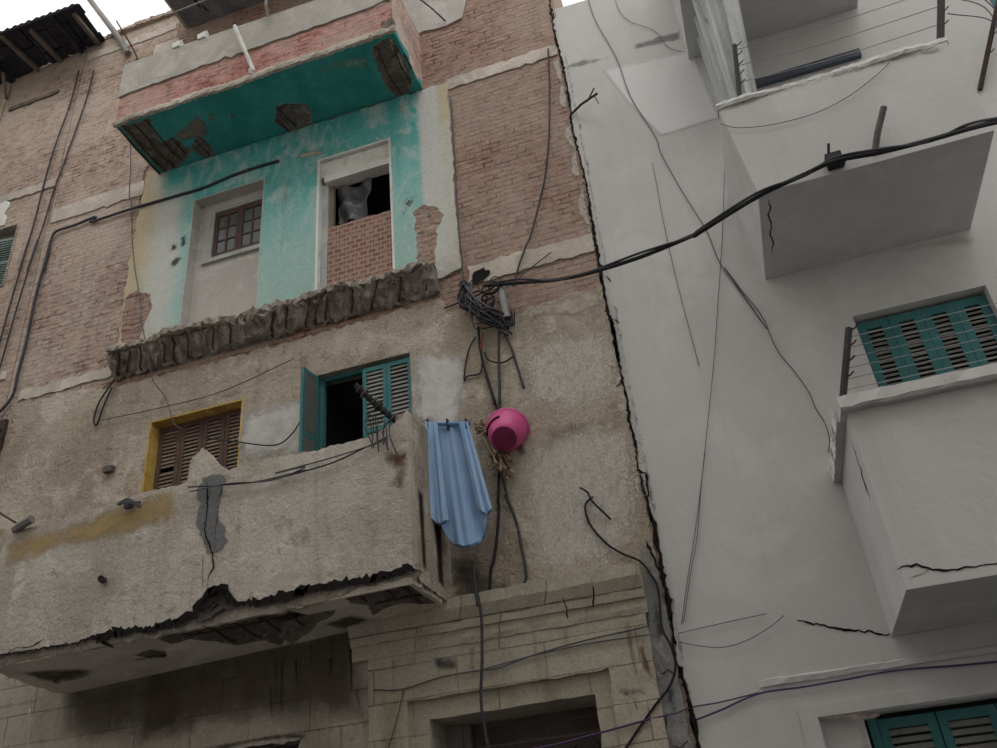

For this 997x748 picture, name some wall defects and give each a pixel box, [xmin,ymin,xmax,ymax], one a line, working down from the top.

spalling [119,115,215,175]
spalling [275,103,312,132]
spalling [413,205,444,271]
crack [766,200,774,250]
spalling [116,290,152,376]
crack [548,0,701,748]
crack [851,442,870,498]
leakage [10,494,172,561]
crack [0,479,223,656]
crack [896,563,997,577]
spalling [0,562,449,666]
crack [797,620,890,636]